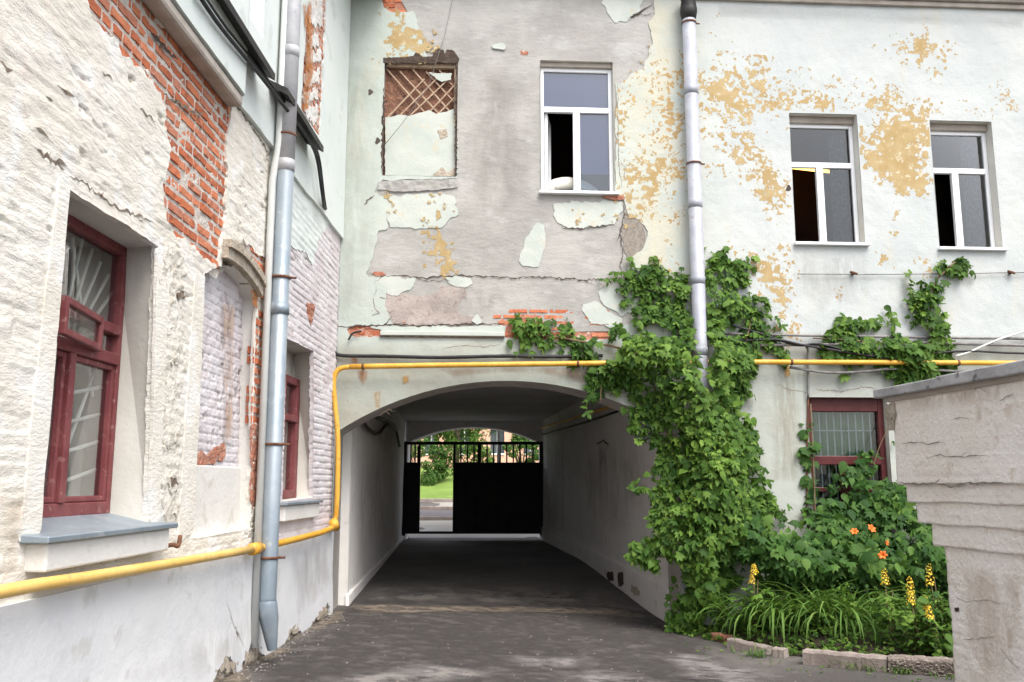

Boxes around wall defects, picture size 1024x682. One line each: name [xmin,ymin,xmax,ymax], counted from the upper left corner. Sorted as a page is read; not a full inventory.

flaking render [88,0,230,522]
flaking render [301,0,325,135]
crack [338,83,626,348]
flaking render [337,0,687,340]
peeling [728,241,802,350]
peeling [698,41,944,236]
peeling [872,21,958,84]
peeling [958,79,1019,120]
flaking render [245,290,264,509]
crack [900,442,1009,488]